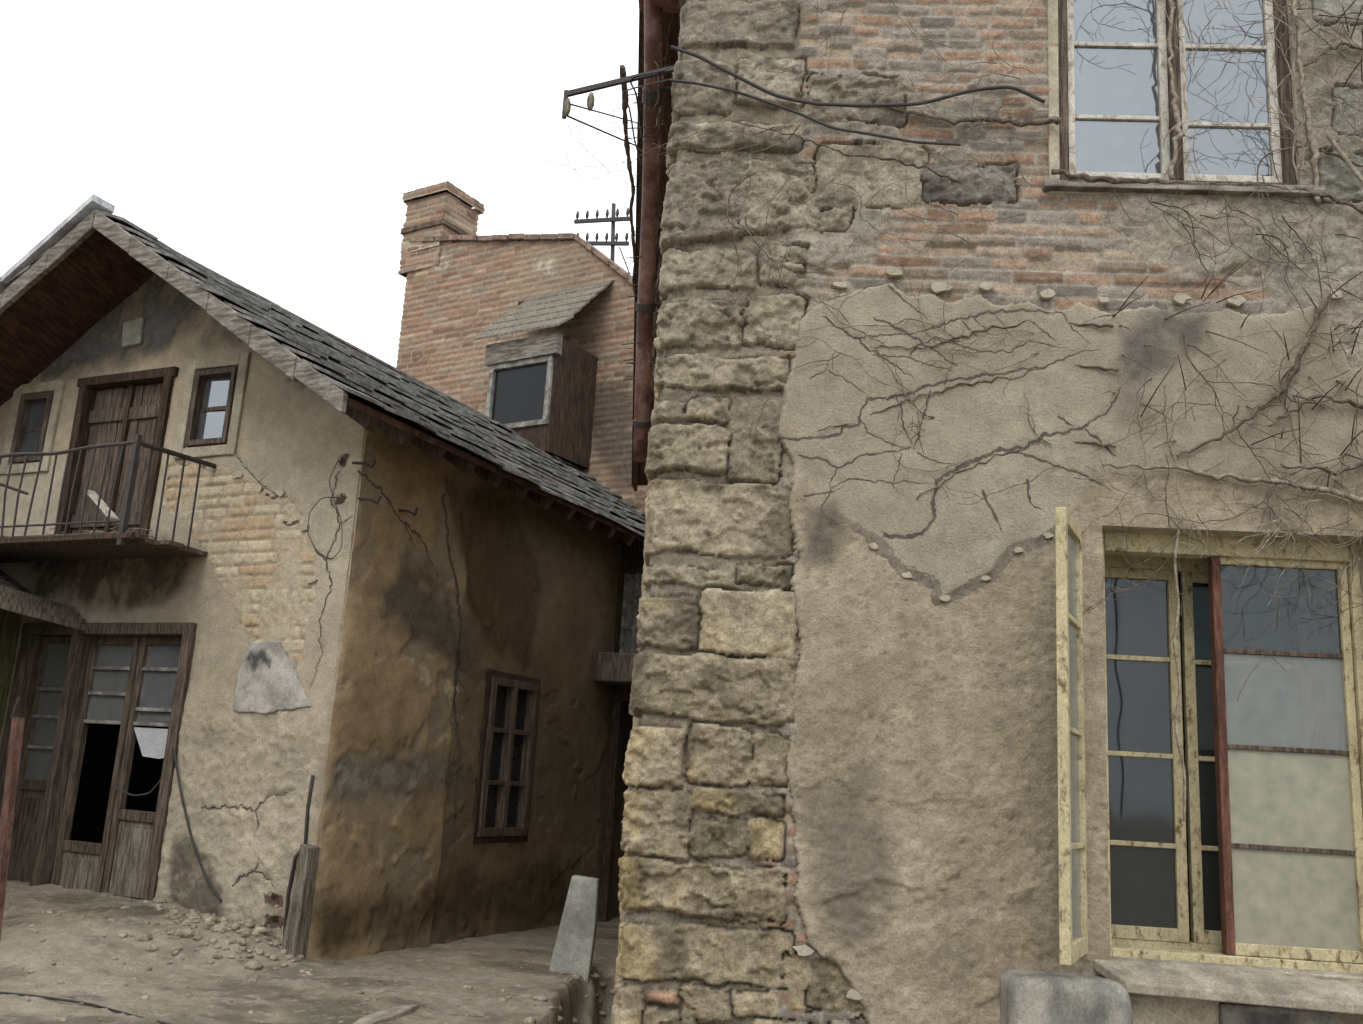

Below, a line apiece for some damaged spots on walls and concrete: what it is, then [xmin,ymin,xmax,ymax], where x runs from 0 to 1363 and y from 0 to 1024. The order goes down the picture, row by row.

spalling [831,69,1363,369]
spalling [162,459,318,673]
crack [310,470,470,865]
leakage [384,568,466,667]
leakage [453,489,539,667]
crack [201,789,294,888]
spalling [778,943,867,1024]